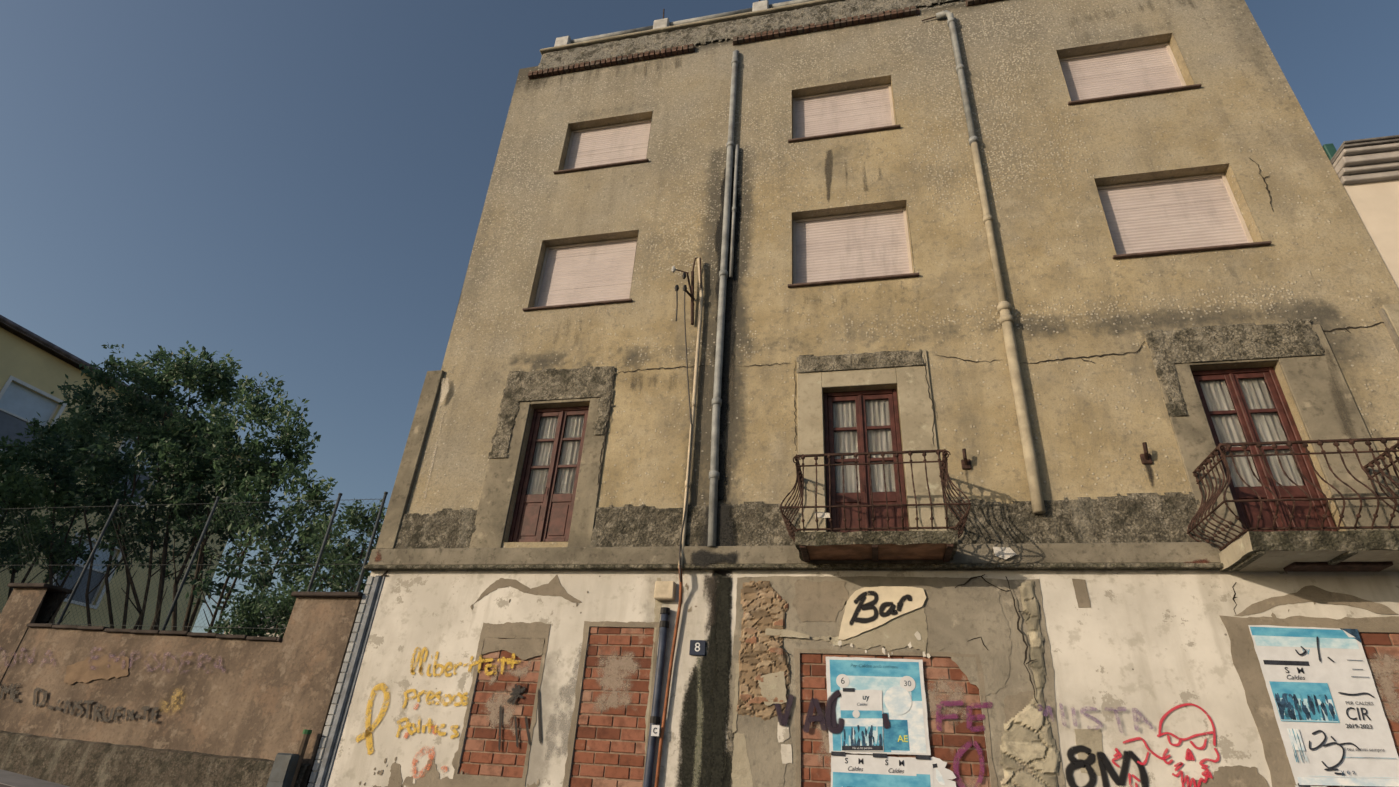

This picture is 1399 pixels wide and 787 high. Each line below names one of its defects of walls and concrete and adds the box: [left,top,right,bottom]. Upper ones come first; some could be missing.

leakage [825,150,847,200]
crack [1249,158,1273,210]
crack [1323,322,1384,332]
crack [1034,341,1145,364]
crack [924,355,994,445]
leakage [676,167,741,787]
flaking render [993,547,1017,560]
flaking render [470,575,588,609]
flaking render [1234,585,1399,618]
flaking render [727,576,1066,787]
peeling [359,736,466,787]
flaking render [1195,765,1269,787]